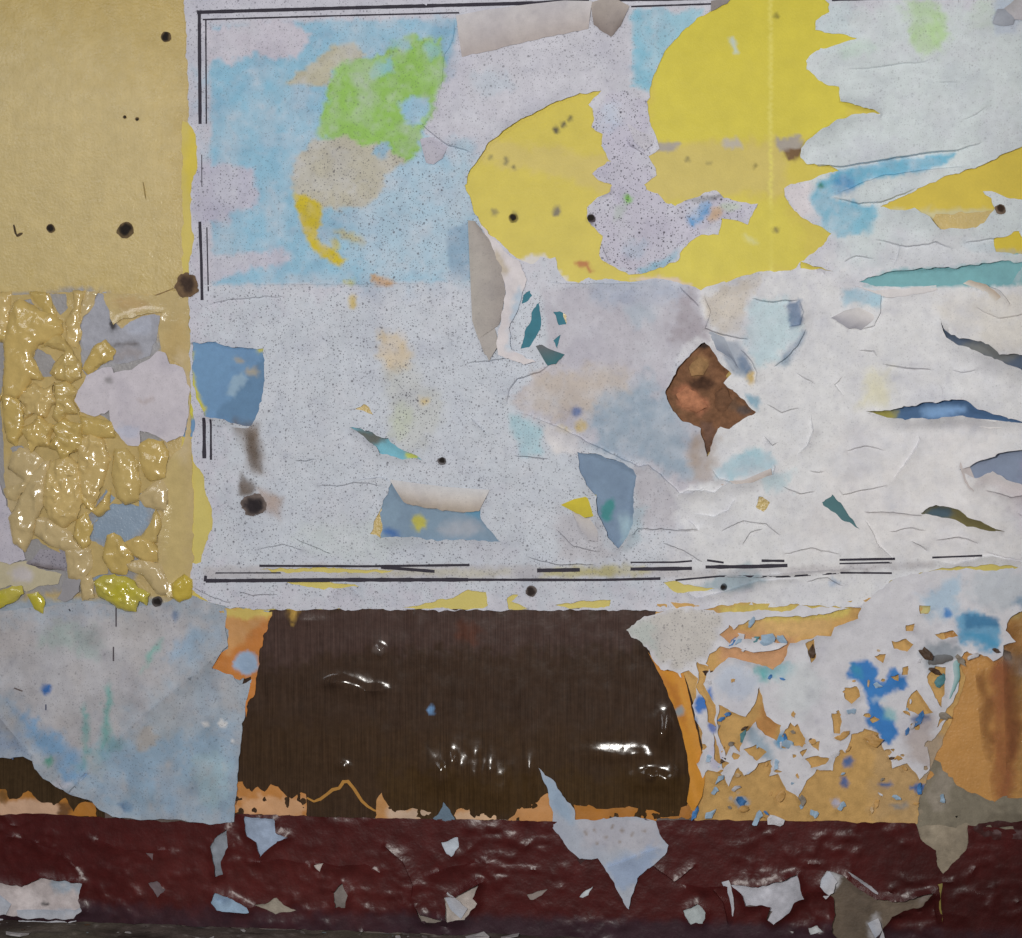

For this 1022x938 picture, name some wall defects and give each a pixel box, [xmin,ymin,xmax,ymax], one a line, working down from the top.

flaking render [80,292,160,364]
spalling [665,342,756,454]
peeling [627,567,1022,873]
peeling [210,830,228,877]
peeling [244,816,287,858]
peeling [441,837,459,857]
peeling [0,878,82,916]
peeling [211,893,295,914]
peeling [417,884,479,923]
peeling [683,904,705,924]
peeling [731,875,804,925]
peeling [808,871,933,938]